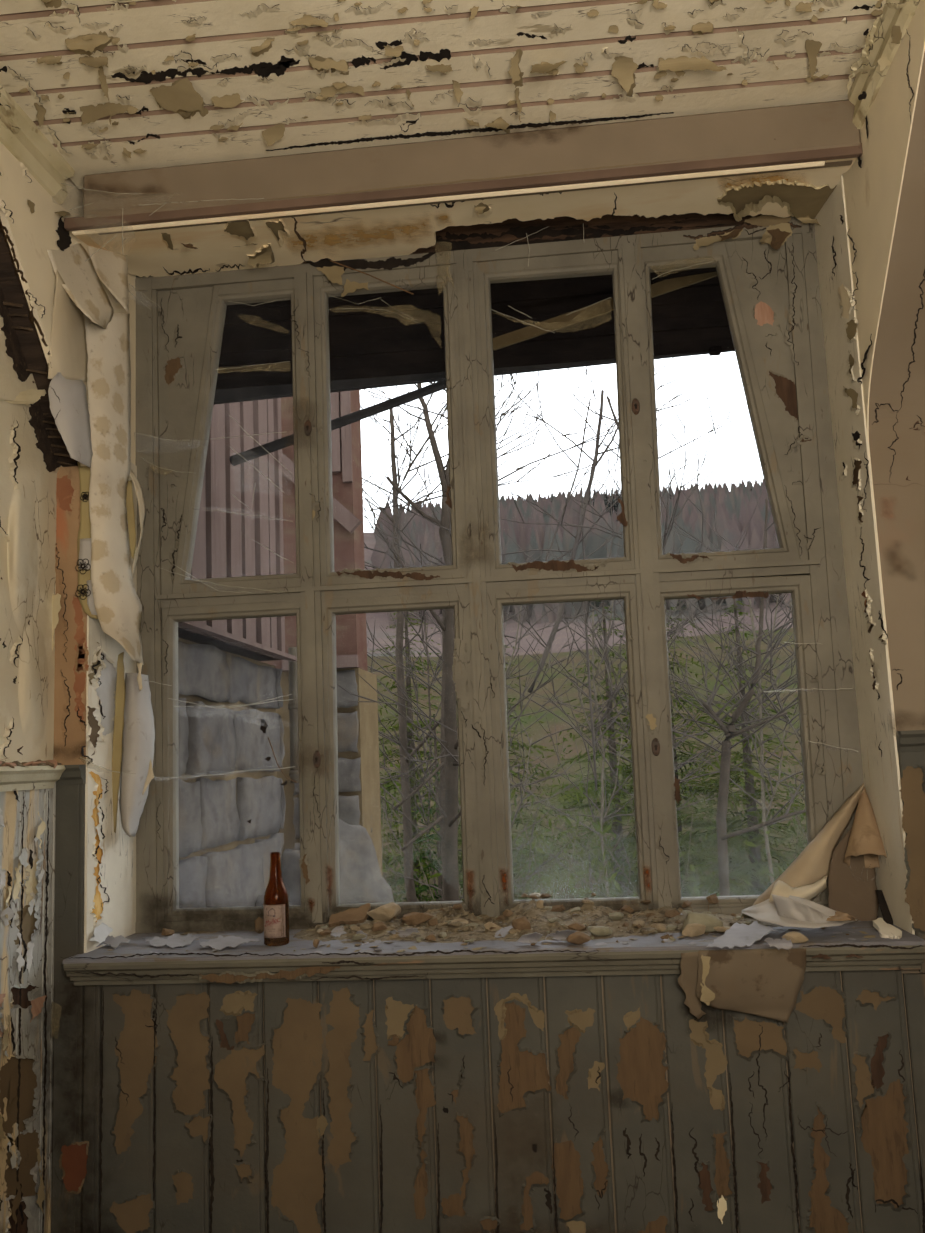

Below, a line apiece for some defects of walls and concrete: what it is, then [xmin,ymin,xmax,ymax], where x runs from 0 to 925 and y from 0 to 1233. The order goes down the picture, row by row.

peeling [0,0,915,160]
flaking render [0,221,77,511]
peeling [223,219,290,268]
flaking render [306,203,723,299]
crack [683,222,802,366]
crack [784,426,821,556]
crack [831,215,925,639]
peeling [0,811,49,1233]
peeling [109,966,361,1233]
crack [623,1128,660,1176]
crack [748,1025,789,1159]
crack [798,1115,918,1218]